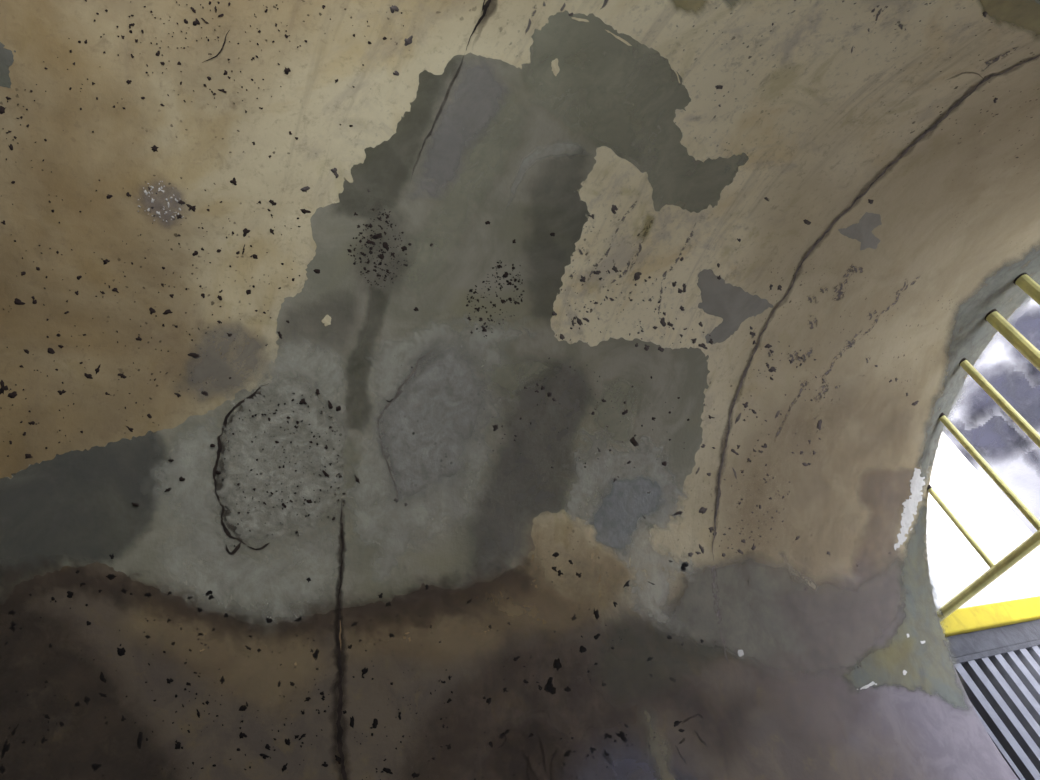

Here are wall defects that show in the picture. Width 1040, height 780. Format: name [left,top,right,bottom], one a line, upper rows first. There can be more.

crack [420,0,497,153]
peeling [0,10,773,626]
crack [711,47,1040,664]
leakage [551,552,582,582]
leakage [669,544,704,572]
leakage [143,590,233,749]
leakage [227,616,329,715]
crack [334,502,348,780]
leakage [523,659,570,695]
leakage [259,718,322,772]
leakage [343,710,387,754]
leakage [513,709,702,780]